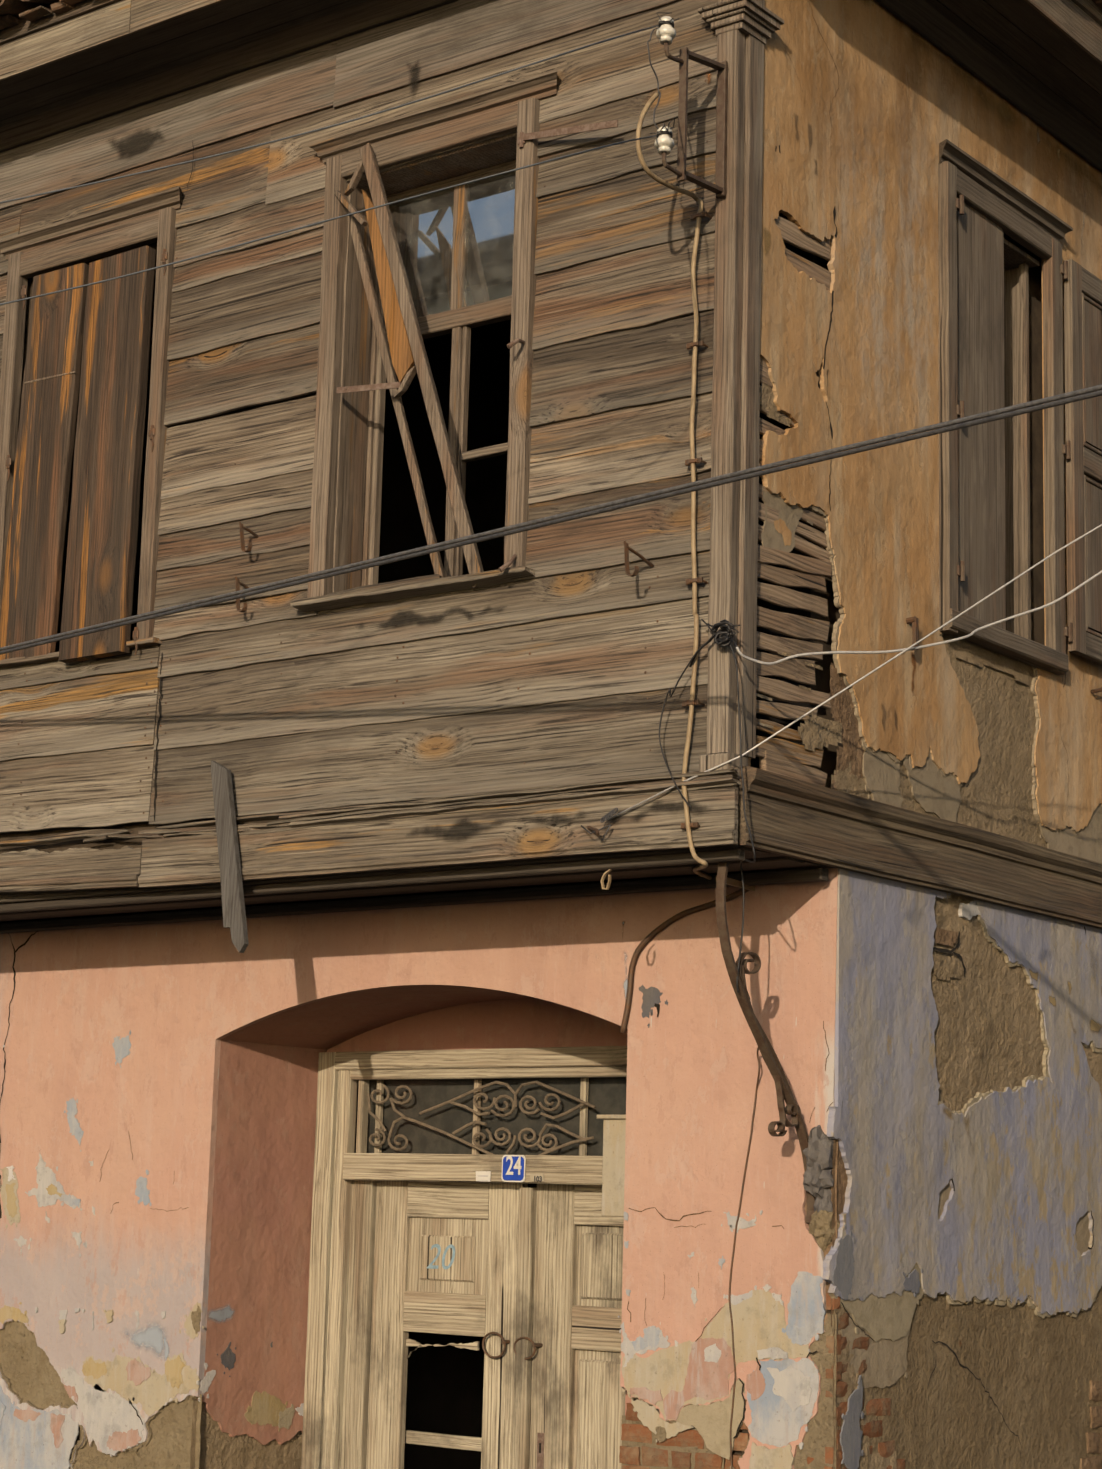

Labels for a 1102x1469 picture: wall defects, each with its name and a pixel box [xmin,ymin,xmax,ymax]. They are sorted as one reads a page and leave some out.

crack [823,290,834,511]
flaking render [751,357,1102,848]
peeling [112,1030,132,1068]
flaking render [931,894,1049,1115]
flaking render [1081,1041,1102,1097]
peeling [0,1154,96,1257]
peeling [64,1098,93,1166]
peeling [135,1169,151,1207]
flaking render [618,1125,1102,1469]
flaking render [0,1302,304,1469]
crack [926,1340,1022,1457]